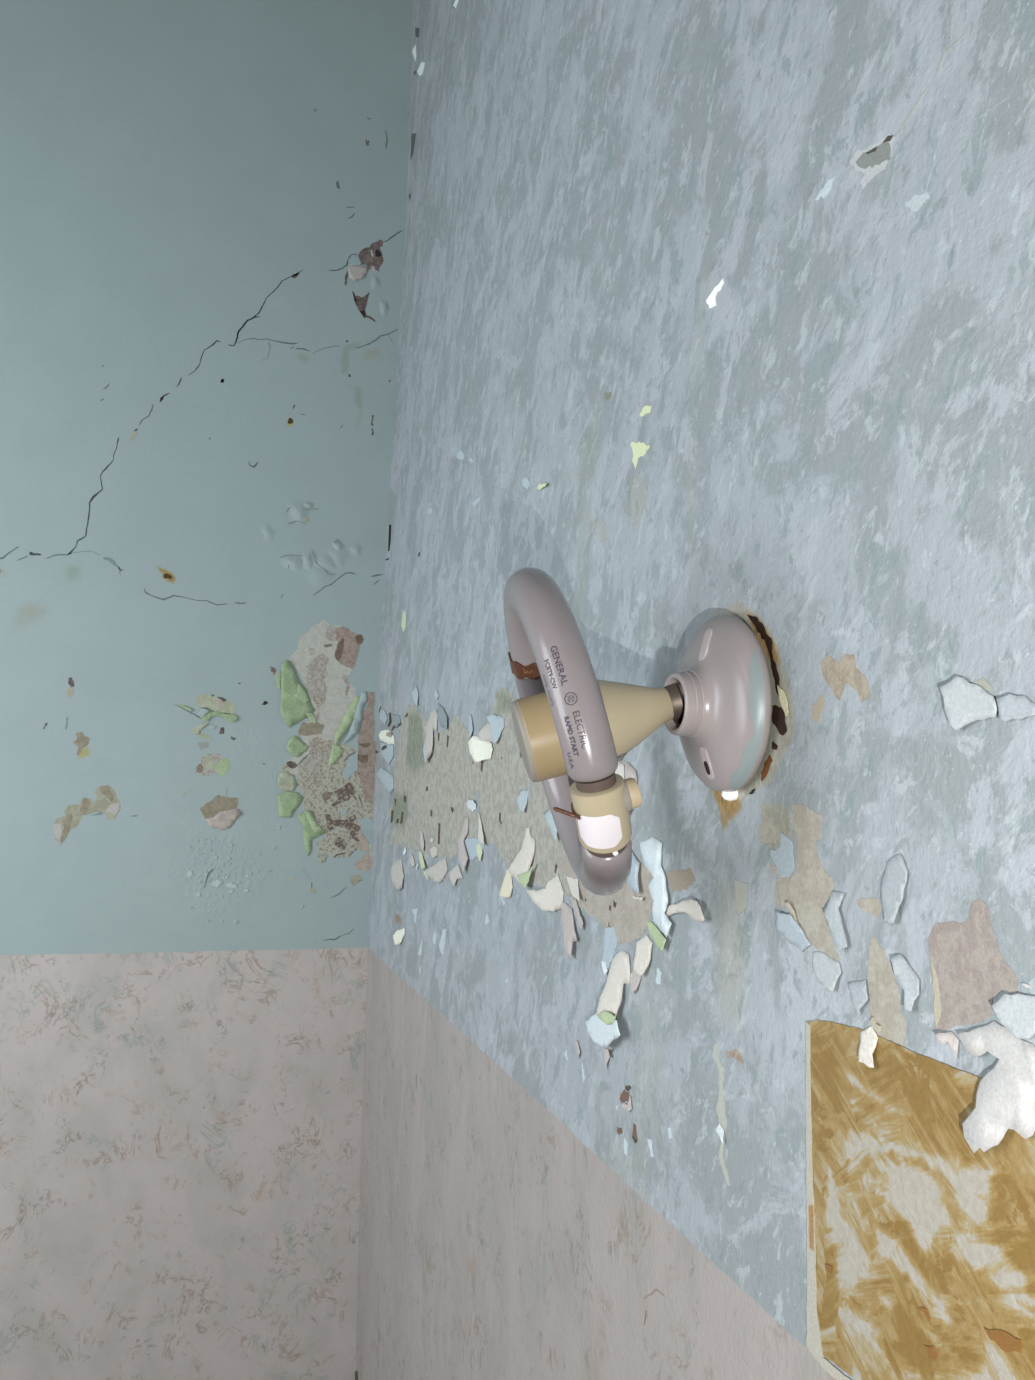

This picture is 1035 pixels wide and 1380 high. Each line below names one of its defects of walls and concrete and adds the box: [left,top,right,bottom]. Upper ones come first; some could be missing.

spalling [345,240,391,323]
crack [0,231,401,605]
flaking render [812,654,871,723]
peeling [939,675,1035,731]
peeling [175,694,241,831]
peeling [54,785,137,845]
peeling [261,621,704,1082]
flaking render [759,804,1035,1153]
peeling [615,1085,654,1158]